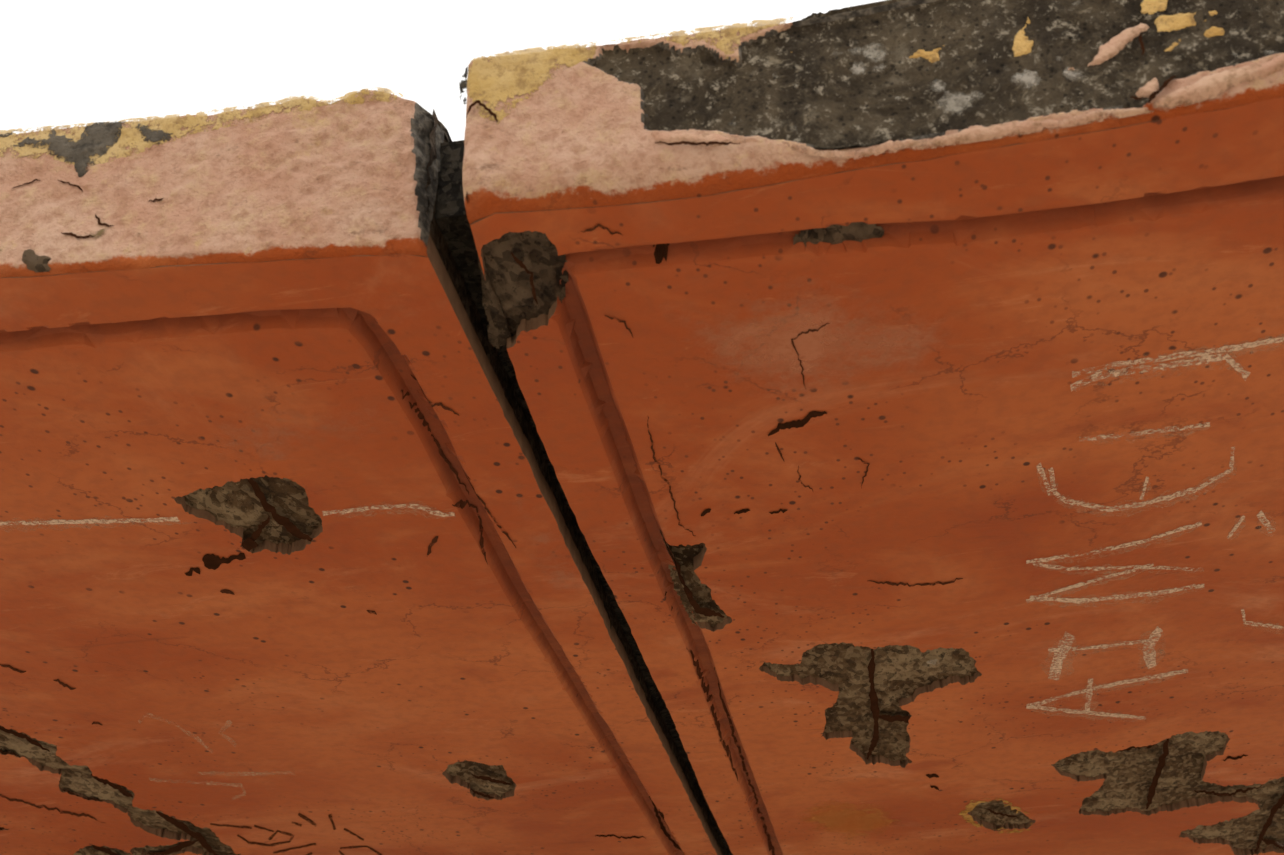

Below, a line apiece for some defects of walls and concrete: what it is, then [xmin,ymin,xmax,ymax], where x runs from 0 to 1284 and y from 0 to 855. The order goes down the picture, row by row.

peeling [0,87,403,165]
crack [466,100,498,122]
crack [655,139,740,147]
spalling [467,0,1284,160]
spalling [475,231,569,349]
spalling [184,475,322,576]
crack [401,375,516,564]
crack [647,323,830,536]
crack [596,796,684,853]
crack [690,650,775,855]
spalling [763,642,979,762]
spalling [1054,731,1284,853]